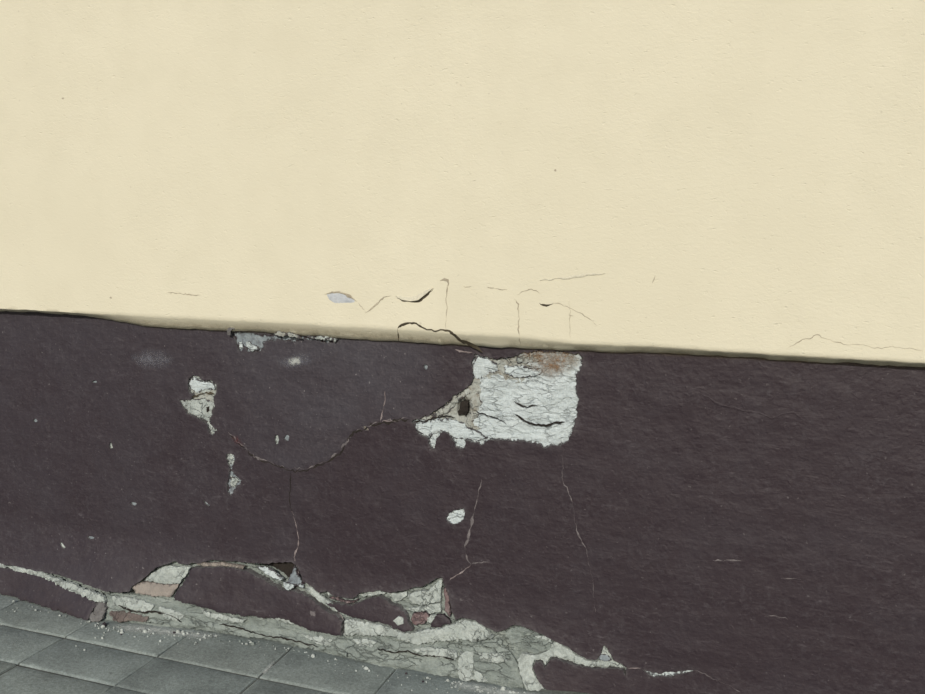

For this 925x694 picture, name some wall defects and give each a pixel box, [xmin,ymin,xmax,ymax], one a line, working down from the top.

peeling [226,327,341,353]
crack [397,278,597,353]
crack [790,334,916,350]
peeling [180,375,217,434]
peeling [413,350,583,448]
peeling [227,454,241,495]
crack [228,392,415,632]
peeling [446,508,465,524]
crack [450,480,484,580]
spalling [49,560,626,691]